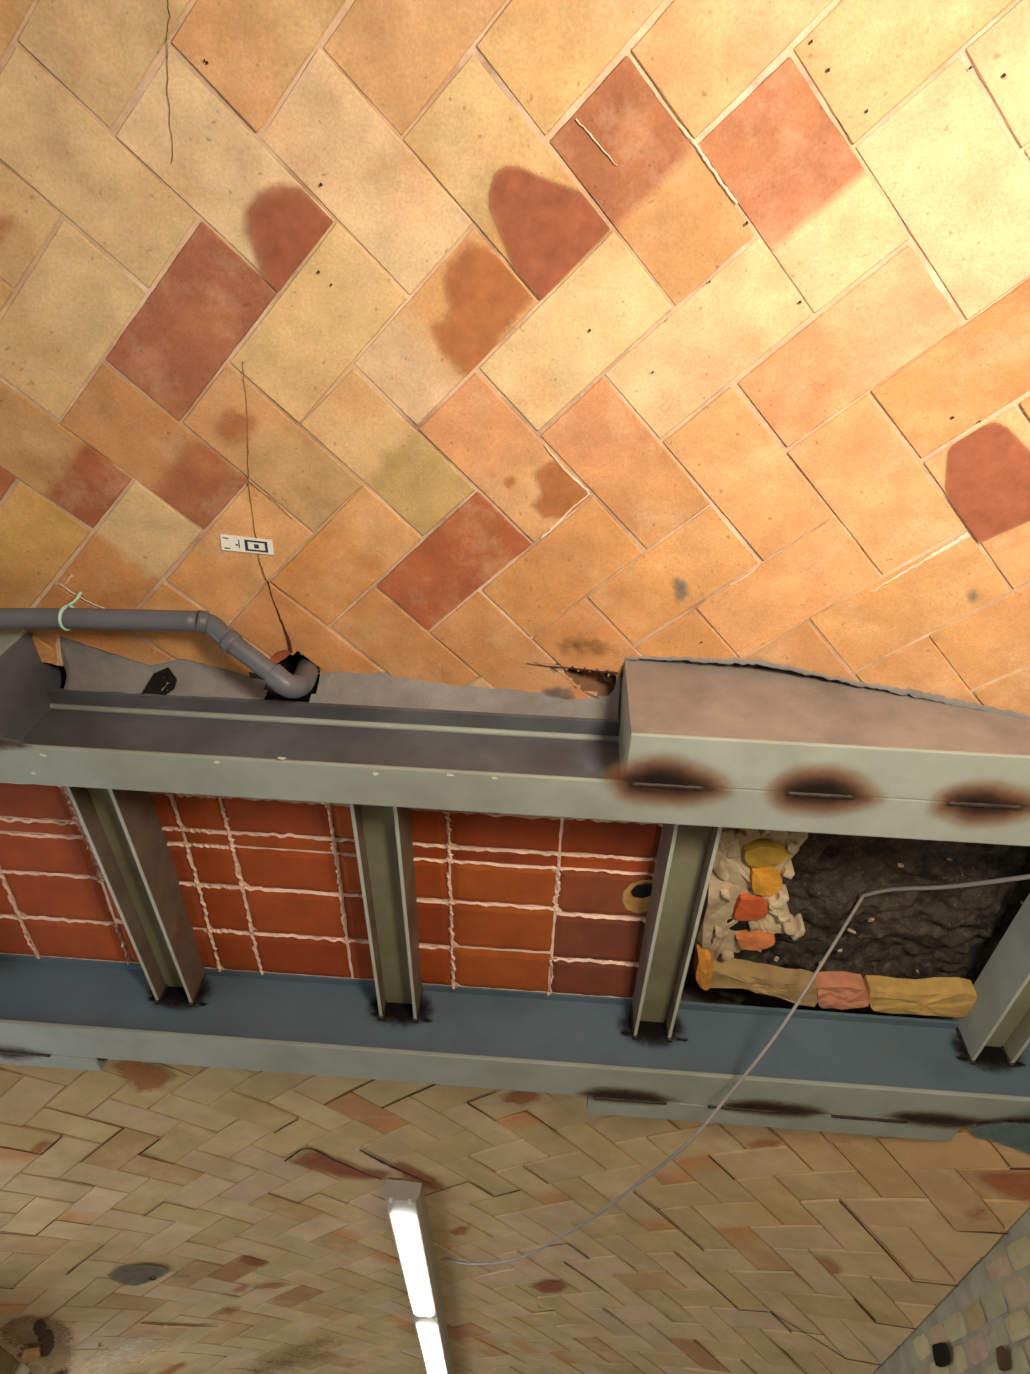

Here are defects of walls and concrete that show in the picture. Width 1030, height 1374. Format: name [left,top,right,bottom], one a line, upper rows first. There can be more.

crack [165,0,173,163]
crack [242,362,293,653]
spalling [527,662,623,703]
spalling [693,827,977,1018]